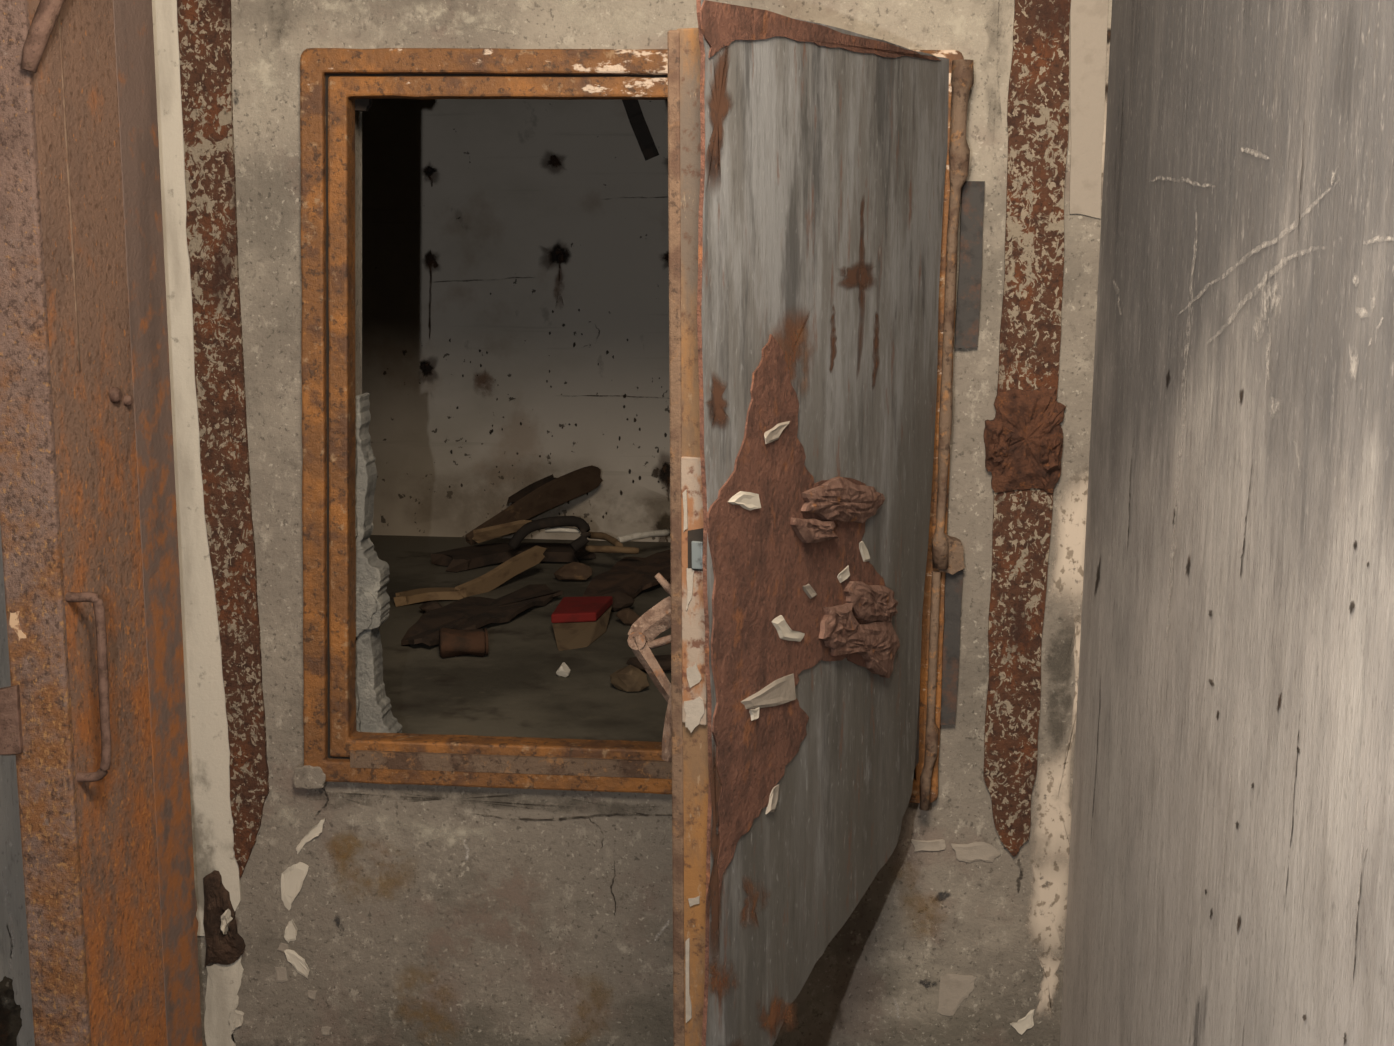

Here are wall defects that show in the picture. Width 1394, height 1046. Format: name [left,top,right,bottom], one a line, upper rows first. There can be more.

rust [425,251,438,338]
rust [550,245,569,290]
rust [841,200,879,387]
rust [420,361,433,376]
rust [829,306,837,371]
rust [658,463,670,542]
spalling [355,393,402,733]
rust [706,318,900,953]
peeling [275,818,325,1000]